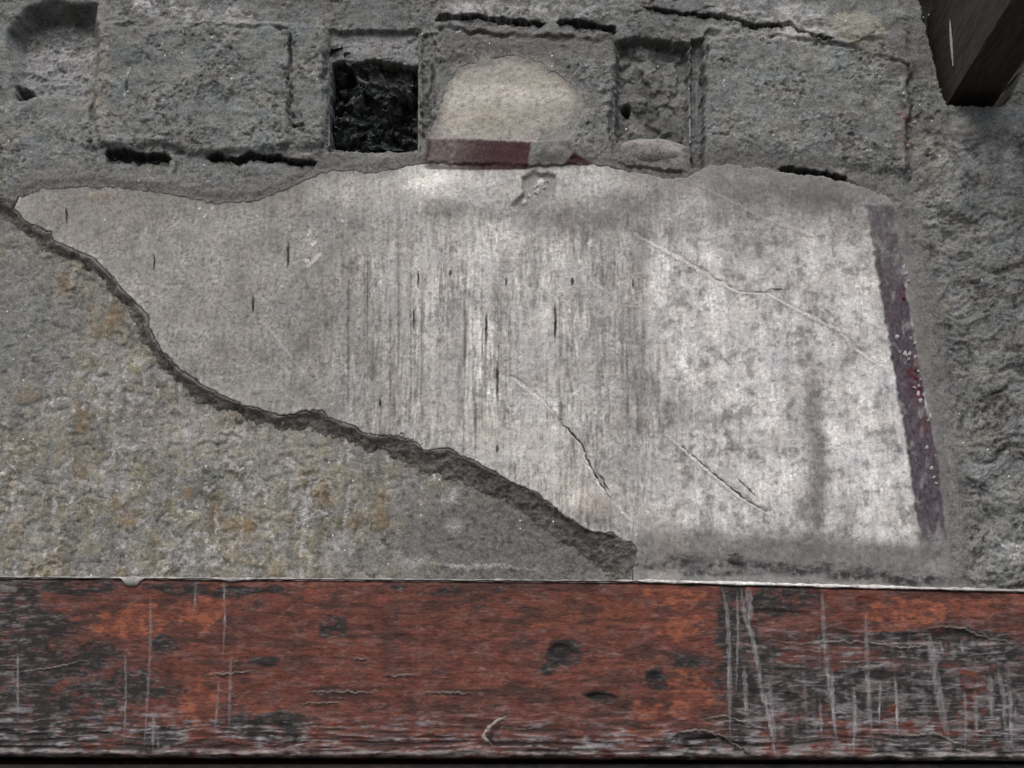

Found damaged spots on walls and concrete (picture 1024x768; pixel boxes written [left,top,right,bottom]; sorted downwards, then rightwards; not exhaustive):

spalling [512,173,556,212]
crack [649,242,870,360]
spalling [0,198,639,583]
crack [508,376,629,520]
crack [674,442,763,510]